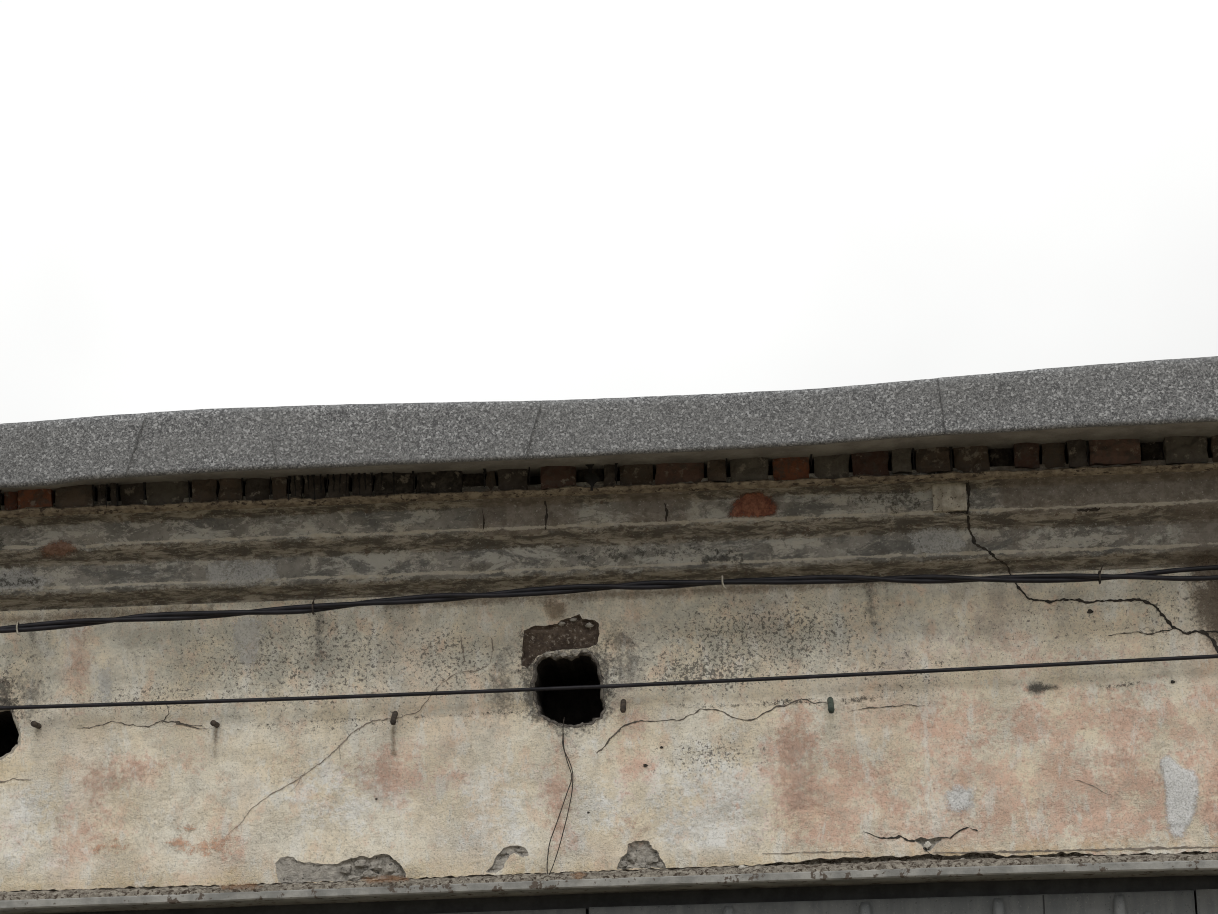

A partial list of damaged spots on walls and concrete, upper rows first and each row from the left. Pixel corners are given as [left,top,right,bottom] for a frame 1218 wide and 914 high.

flaking render [728,492,777,518]
crack [927,449,1218,653]
spalling [521,614,606,728]
hole [0,710,21,760]
crack [230,638,494,832]
crack [596,698,924,753]
flaking render [249,755,1218,885]
crack [762,827,1218,856]
flaking render [3,884,233,892]